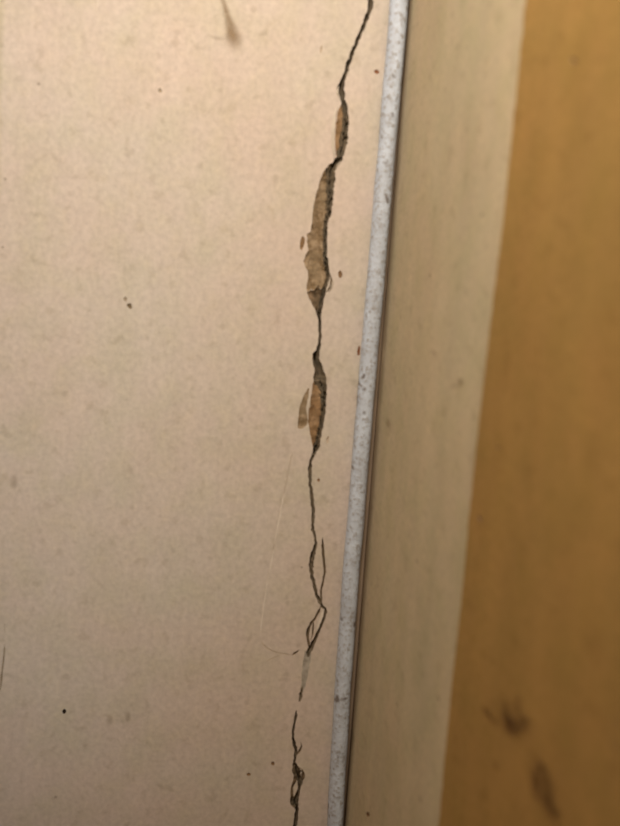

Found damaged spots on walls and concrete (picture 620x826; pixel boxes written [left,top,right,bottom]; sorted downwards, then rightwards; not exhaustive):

spalling [331,106,343,168]
spalling [300,169,343,313]
spalling [298,381,329,446]
crack [261,0,373,826]